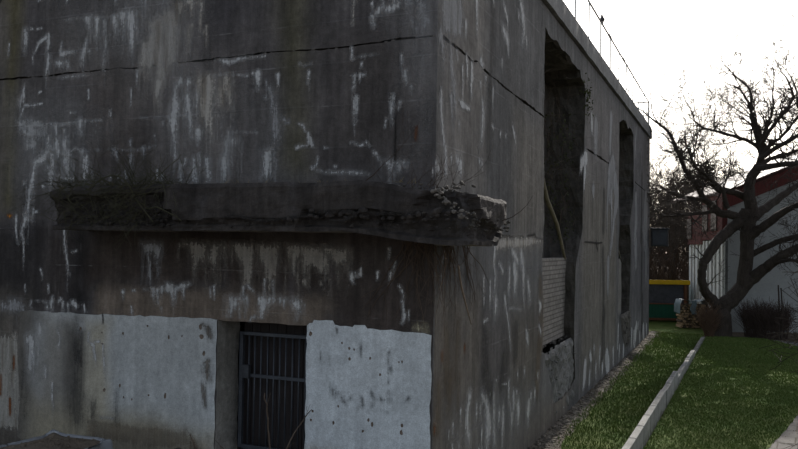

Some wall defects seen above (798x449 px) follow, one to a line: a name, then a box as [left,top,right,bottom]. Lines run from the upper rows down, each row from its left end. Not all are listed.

efflorescence [24,27,90,75]
crack [0,64,157,80]
efflorescence [85,0,208,103]
efflorescence [153,73,231,156]
efflorescence [246,70,286,177]
crack [176,35,543,116]
spalling [430,187,511,232]
efflorescence [142,244,189,299]
water stain [179,242,301,321]
water stain [287,245,347,285]
water stain [448,237,541,449]
spalling [545,338,577,413]